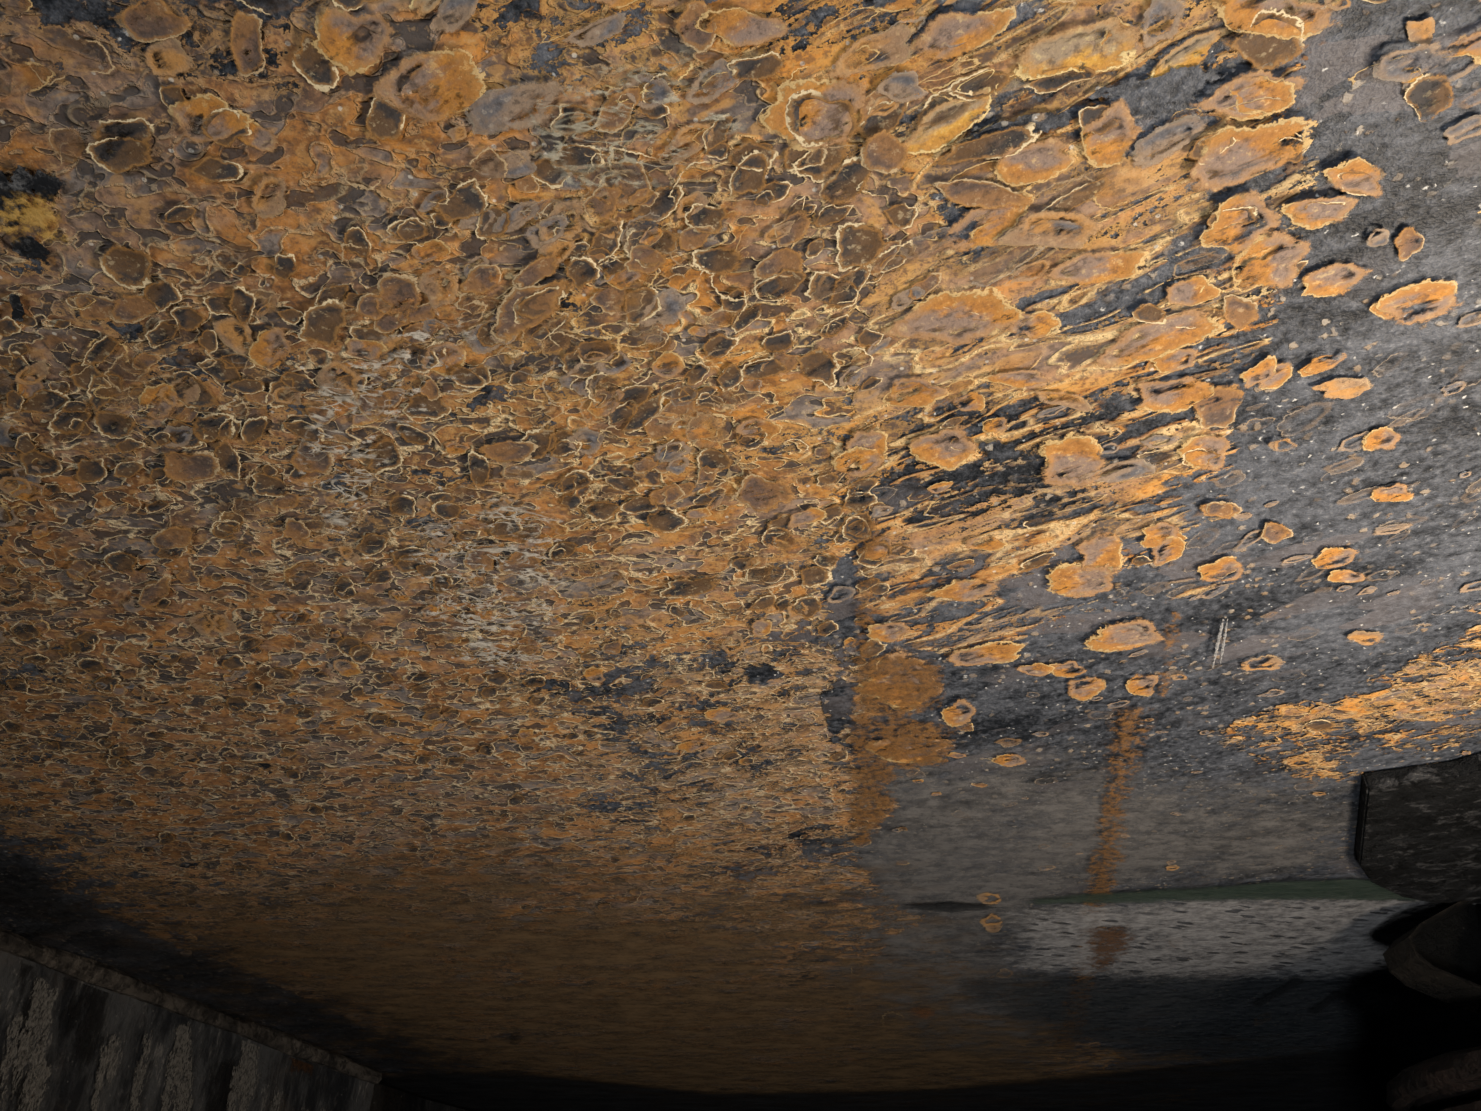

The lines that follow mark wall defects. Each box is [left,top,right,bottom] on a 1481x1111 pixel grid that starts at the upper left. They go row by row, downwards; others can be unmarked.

rust [1348,17,1481,145]
rust [1323,157,1383,198]
rust [1301,263,1372,298]
rust [1369,279,1461,325]
rust [1312,377,1373,399]
peeling [1441,381,1476,396]
peeling [1321,431,1369,481]
peeling [1185,501,1279,555]
peeling [1373,504,1427,538]
peeling [1315,570,1400,596]
peeling [1440,581,1481,615]
rust [1210,603,1481,797]